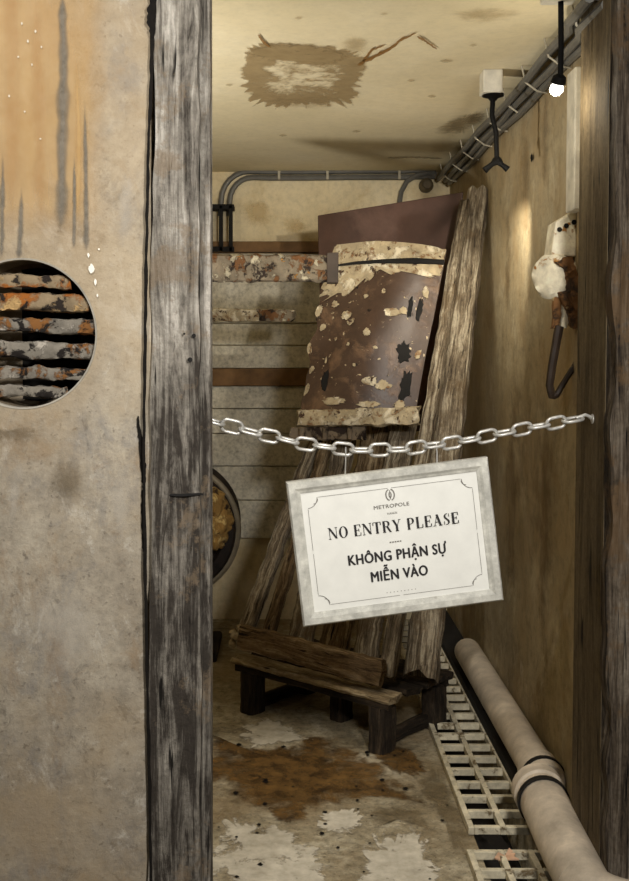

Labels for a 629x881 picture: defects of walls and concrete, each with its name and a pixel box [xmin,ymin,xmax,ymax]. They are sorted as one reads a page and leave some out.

rust [0,0,85,208]
damp [58,1,88,246]